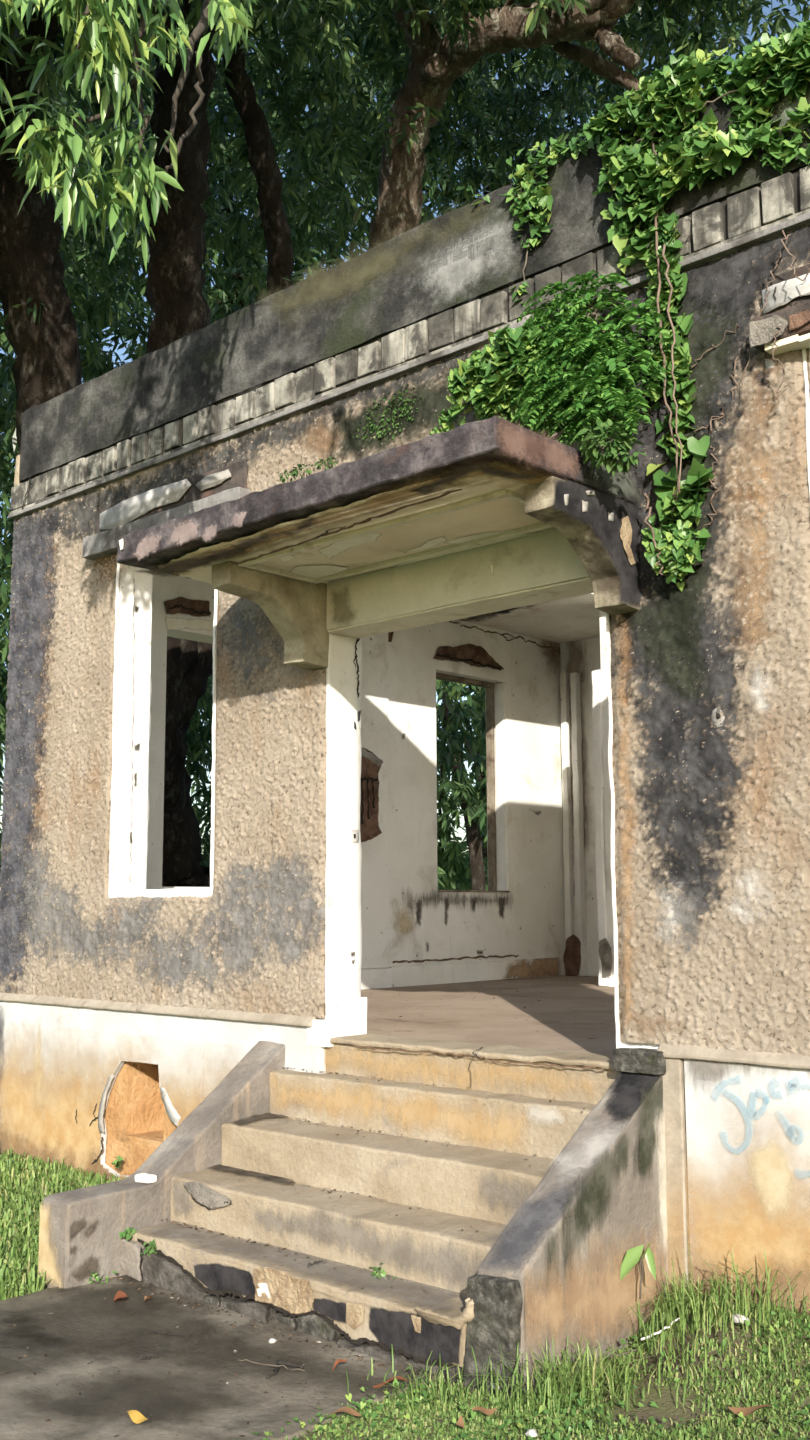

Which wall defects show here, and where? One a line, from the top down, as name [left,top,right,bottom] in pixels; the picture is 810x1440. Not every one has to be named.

spalling [749,273,810,347]
flaking render [99,469,246,560]
water stain [498,224,810,950]
water stain [0,348,476,993]
flaking render [434,643,504,671]
flaking render [352,748,383,843]
water stain [402,891,511,925]
water stain [690,1059,751,1079]
water stain [0,1136,118,1182]
water stain [154,1072,810,1364]
flaking render [253,1267,314,1314]
spalling [415,1297,474,1330]